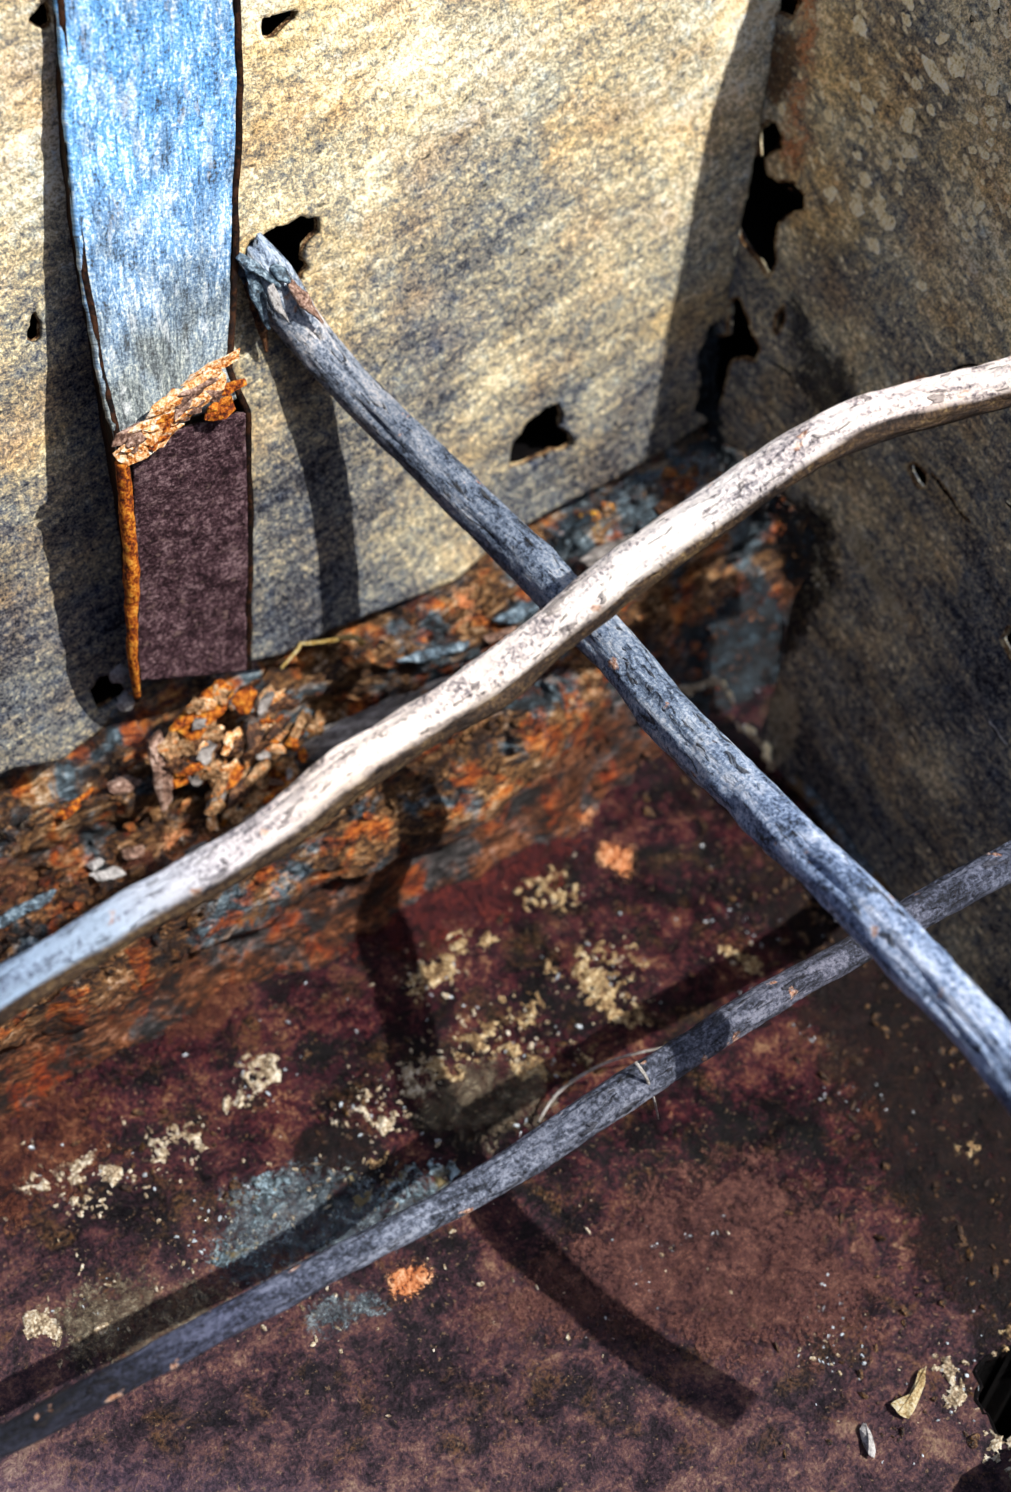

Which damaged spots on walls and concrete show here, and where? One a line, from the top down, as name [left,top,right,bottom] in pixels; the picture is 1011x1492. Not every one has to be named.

peeling [988,0,1002,14]
corrosion [765,26,802,109]
spalling [263,216,314,275]
spalling [509,405,568,463]
corrosion [0,232,1011,1027]
corrosion [0,615,1011,1459]
spalling [931,1325,1011,1480]